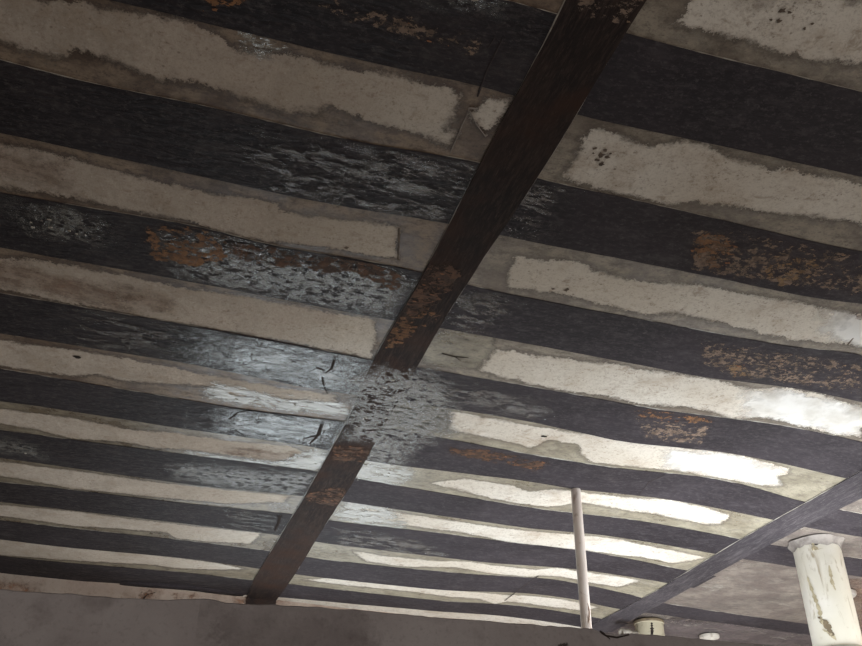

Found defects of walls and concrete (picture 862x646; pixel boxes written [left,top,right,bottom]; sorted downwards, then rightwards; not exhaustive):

rust [578,0,643,23]
water stain [0,0,515,359]
water stain [520,115,862,251]
rust [144,226,402,294]
rust [691,230,862,296]
rust [385,260,461,348]
water stain [0,235,862,551]
rust [637,409,709,444]
rust [701,341,860,389]
water stain [770,527,862,558]